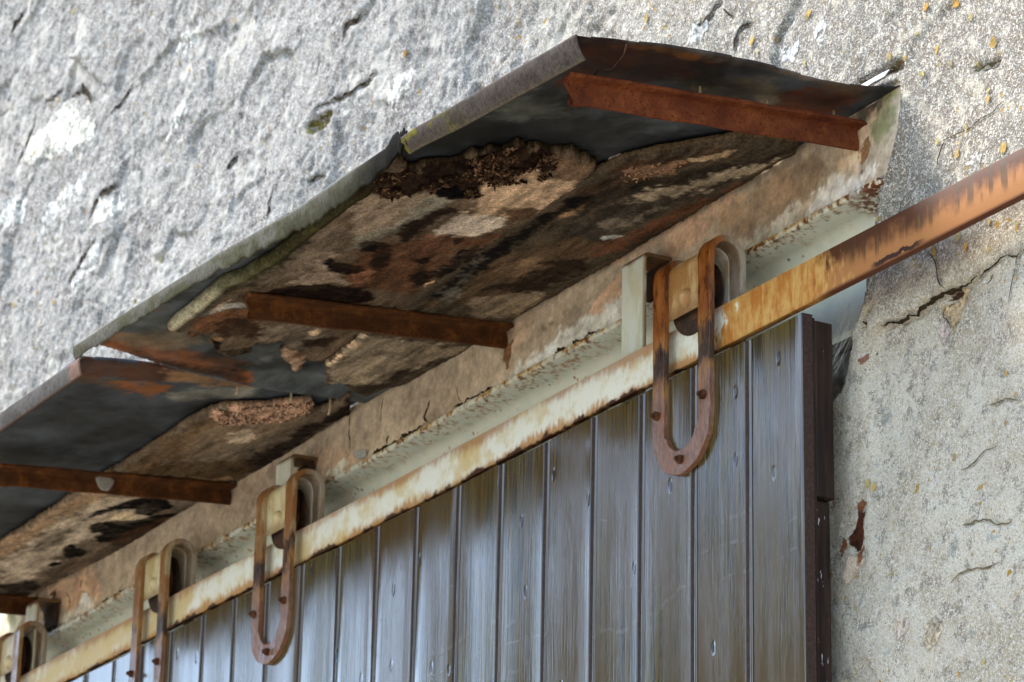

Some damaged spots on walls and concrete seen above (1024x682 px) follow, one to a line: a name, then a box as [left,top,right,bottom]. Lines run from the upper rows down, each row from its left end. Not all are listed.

crack [881,252,1020,326]